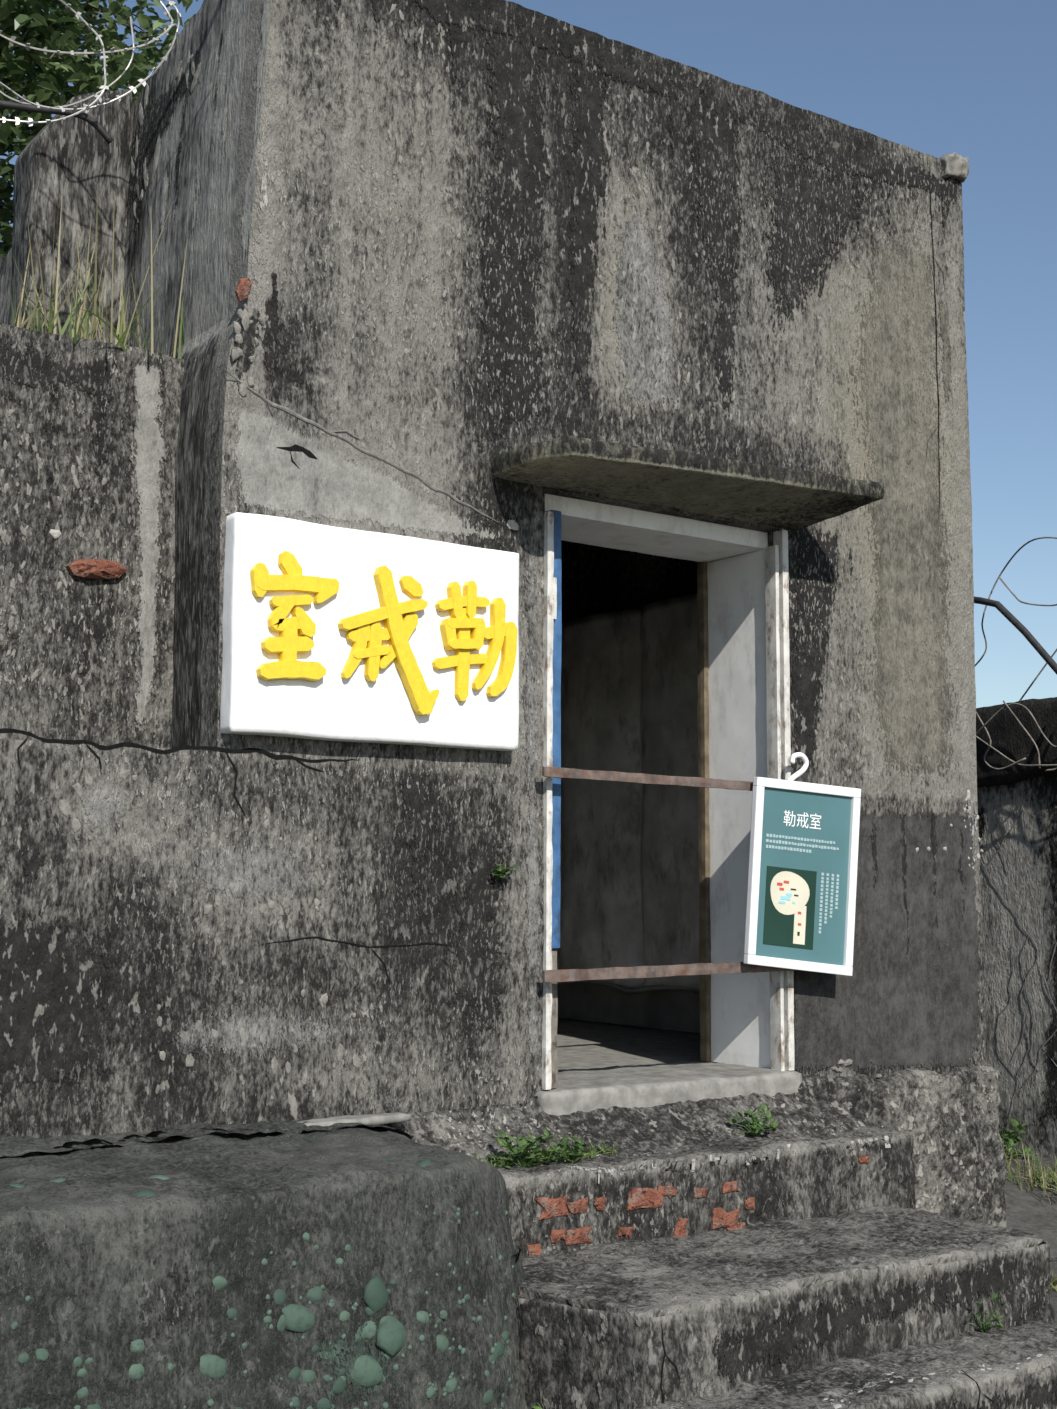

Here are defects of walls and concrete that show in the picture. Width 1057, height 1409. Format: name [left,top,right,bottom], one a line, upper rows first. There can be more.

damp [412,0,960,468]
damp [261,269,284,384]
crack [0,728,357,818]
crack [265,921,458,984]
damp [794,805,988,1073]
damp [1035,943,1057,1125]
spalling [526,1194,609,1256]
spalling [617,1227,634,1238]
spalling [672,1217,688,1237]
spalling [626,1181,755,1231]
damp [129,1255,227,1356]